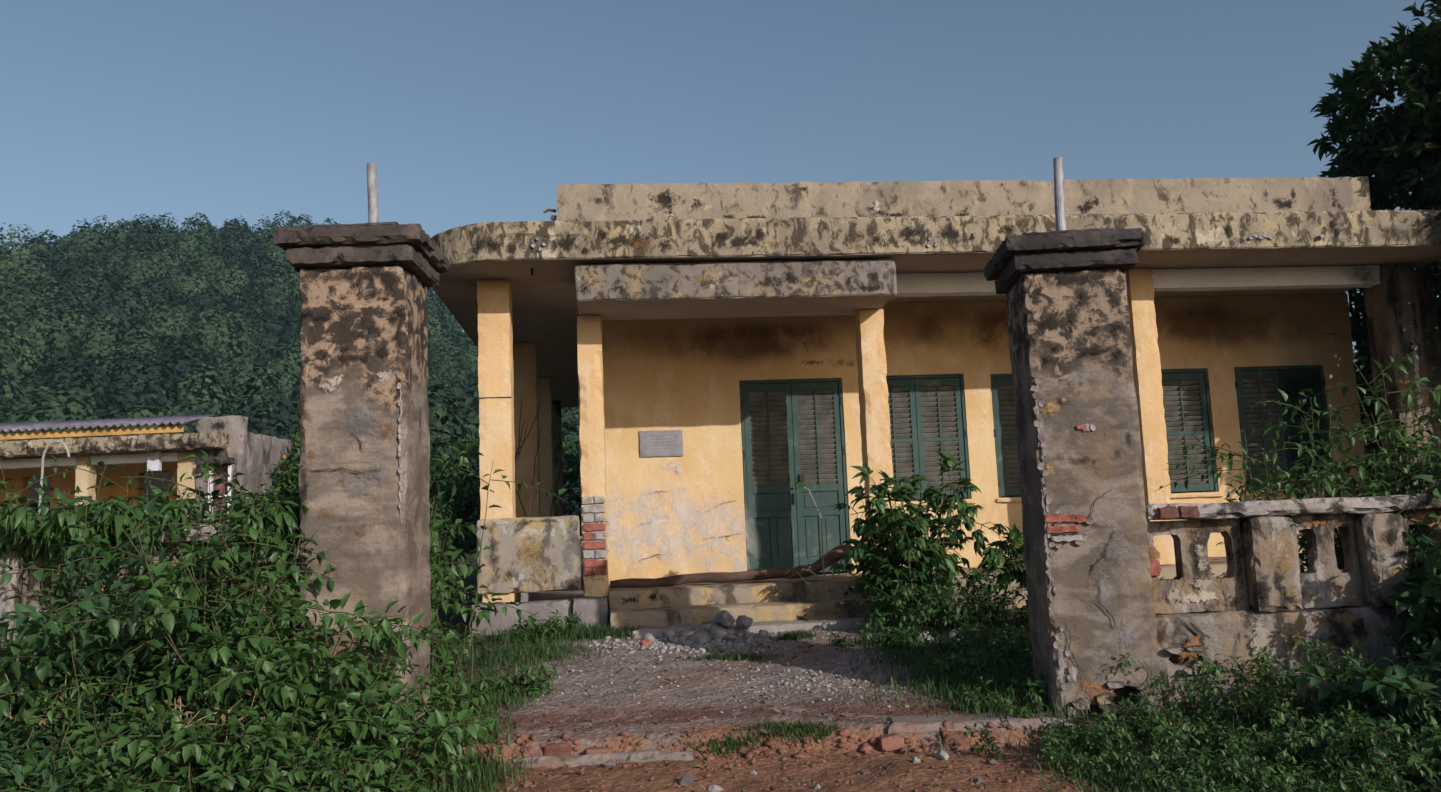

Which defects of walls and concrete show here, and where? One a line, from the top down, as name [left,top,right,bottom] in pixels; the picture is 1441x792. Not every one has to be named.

leakage [471,236,516,260]
mould [550,189,705,254]
mould [712,215,768,249]
mould [865,206,975,247]
leakage [755,271,797,289]
leakage [833,266,880,292]
mould [303,270,423,364]
leakage [1033,272,1127,364]
flaking render [580,494,744,585]
flaking render [1030,371,1151,717]
flaking render [1165,636,1220,674]